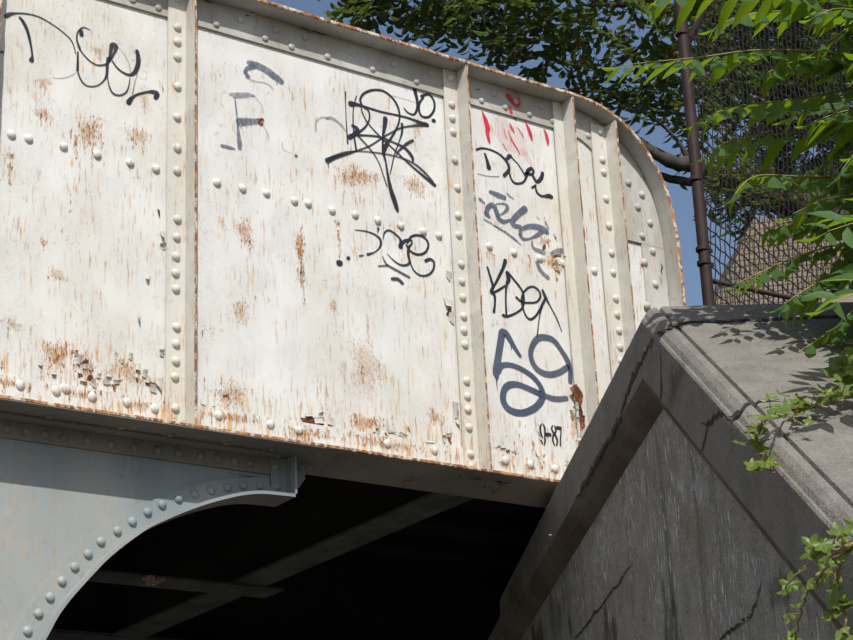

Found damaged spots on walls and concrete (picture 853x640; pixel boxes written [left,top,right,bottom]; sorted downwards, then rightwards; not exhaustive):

rust [69,116,104,159]
rust [334,163,380,192]
peeling [71,349,122,391]
peeling [121,353,163,393]
rust [214,378,258,422]
peeling [301,412,334,425]
rust [278,413,427,456]
crack [575,315,846,500]
crack [573,563,632,640]
crack [719,583,761,640]